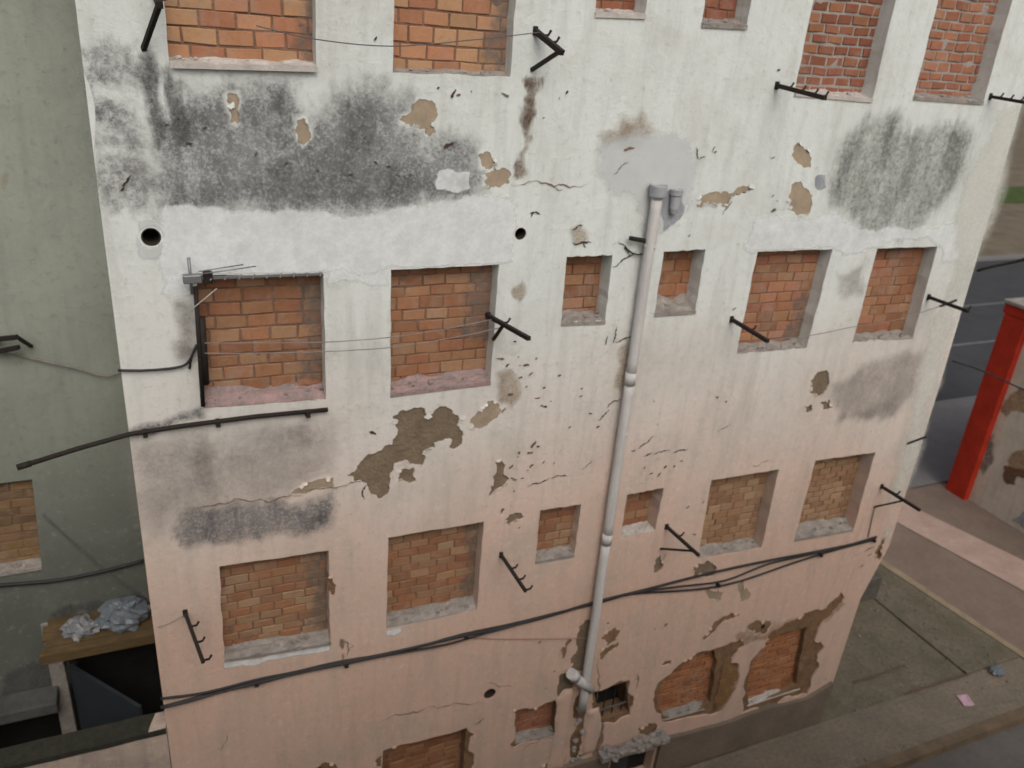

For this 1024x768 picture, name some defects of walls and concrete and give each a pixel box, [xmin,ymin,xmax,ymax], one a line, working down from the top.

leakage [92,46,481,214]
flaking render [400,87,440,136]
crack [521,180,586,191]
flaking render [696,184,756,208]
flaking render [772,181,812,218]
flaking render [792,142,811,168]
mould [832,118,969,232]
flaking render [348,393,513,498]
crack [184,480,367,510]
mould [177,497,331,545]
spalling [638,582,844,736]
flaking render [546,619,597,758]